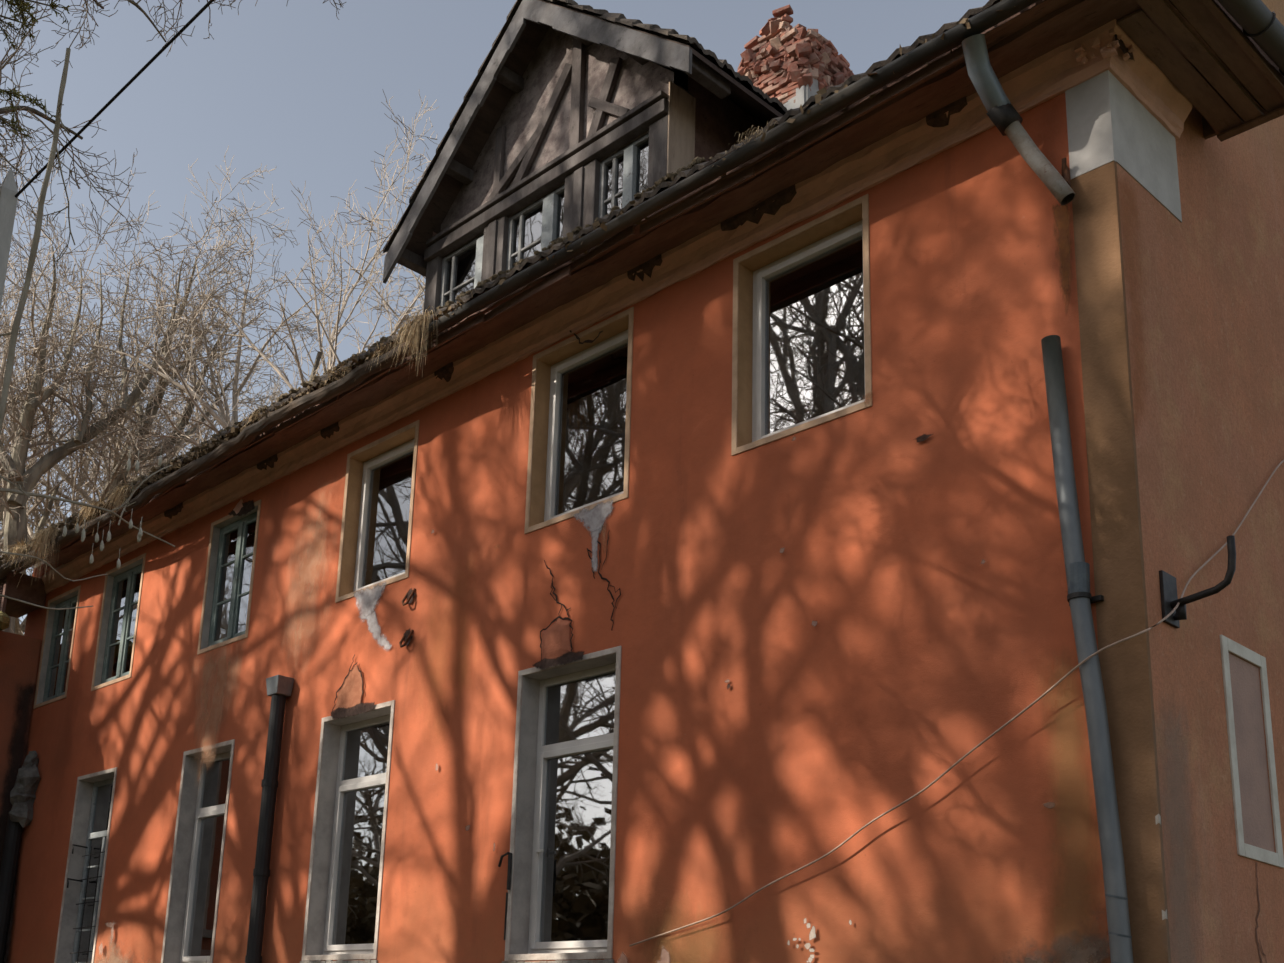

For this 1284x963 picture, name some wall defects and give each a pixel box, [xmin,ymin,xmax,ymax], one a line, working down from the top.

crack [544,560,571,617]
crack [587,530,621,630]
flaking render [331,655,375,719]
damp [0,685,35,963]
crack [1256,862,1267,963]